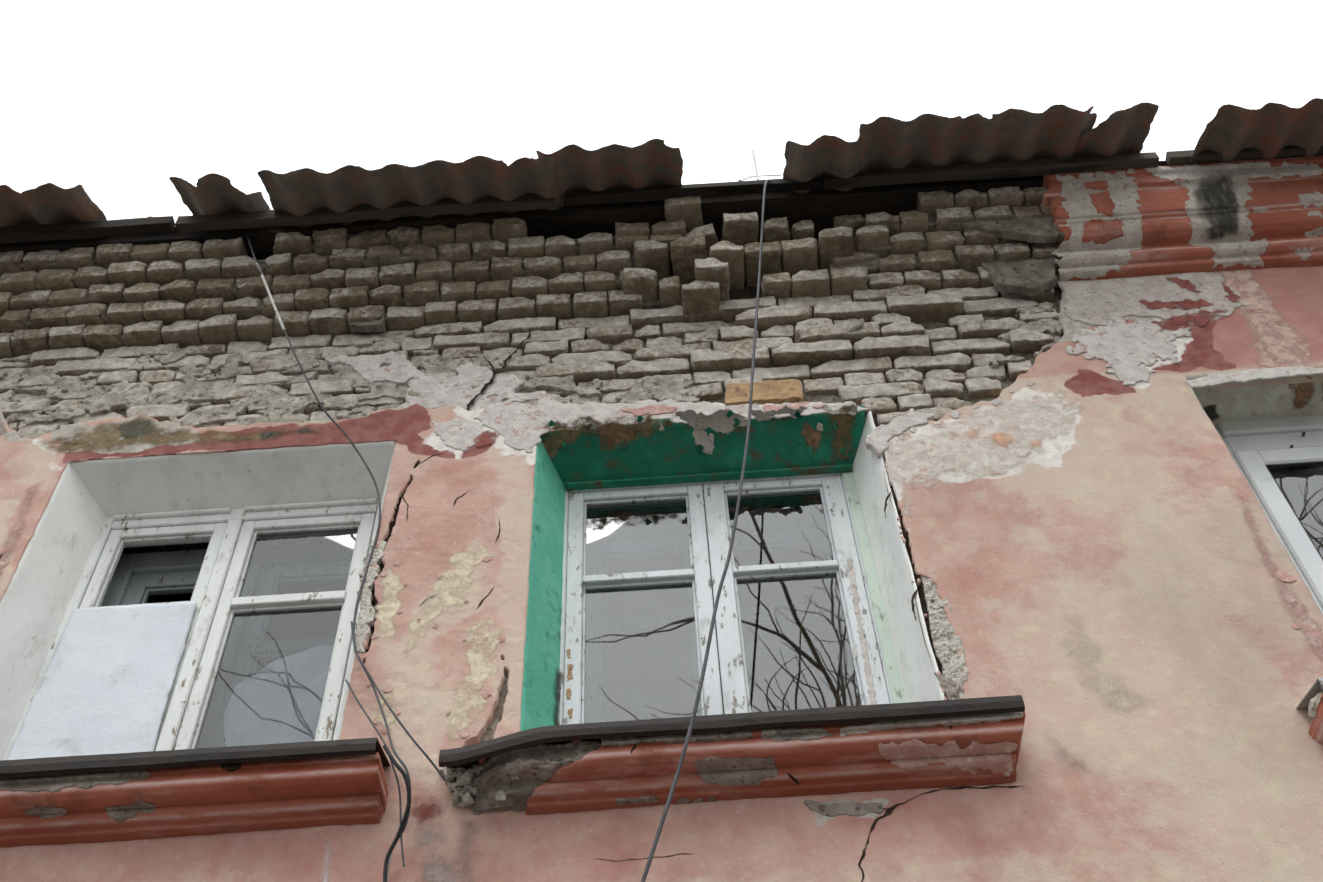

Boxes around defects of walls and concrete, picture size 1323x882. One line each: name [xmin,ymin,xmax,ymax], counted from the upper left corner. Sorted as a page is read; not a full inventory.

damp [1195,176,1238,239]
flaking render [0,161,1323,515]
crack [353,453,443,663]
peeling [371,544,495,653]
peeling [446,618,505,739]
crack [880,456,952,729]
flaking render [921,571,970,700]
peeling [0,769,150,819]
peeling [105,800,155,824]
spalling [439,765,484,808]
peeling [601,712,1023,806]
crack [858,785,1020,882]